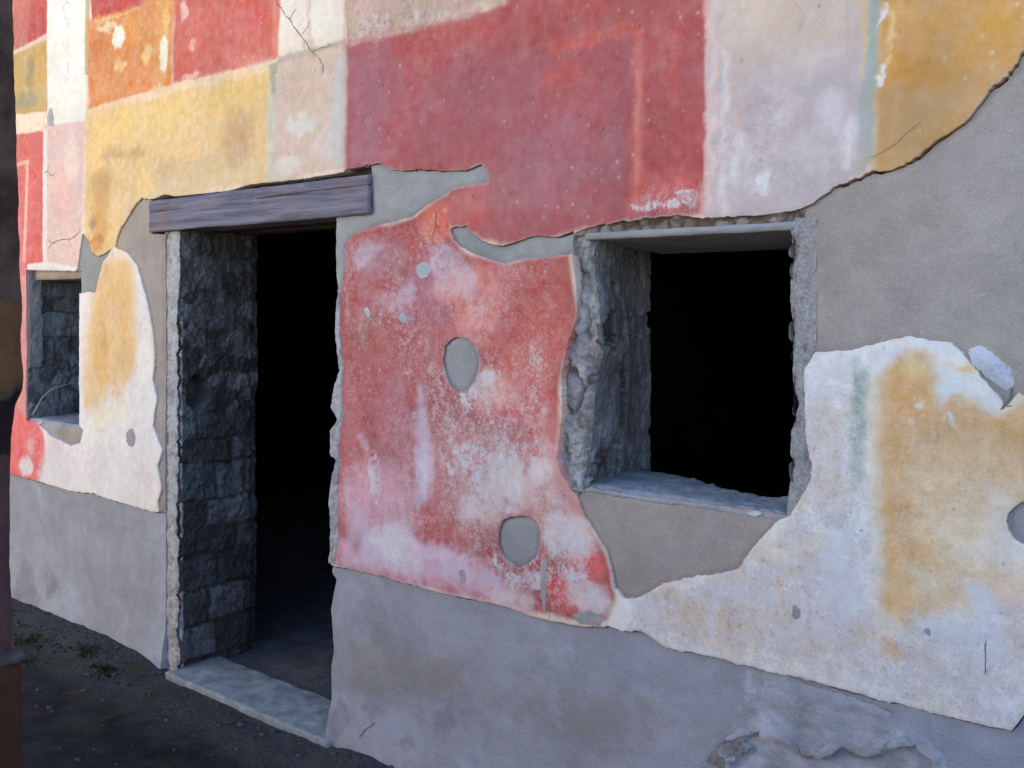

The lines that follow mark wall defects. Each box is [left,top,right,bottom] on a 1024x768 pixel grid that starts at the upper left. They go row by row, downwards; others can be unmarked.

crack [276,0,333,74]
crack [870,119,923,157]
spalling [78,199,186,670]
flaking render [328,164,490,564]
leakage [453,364,507,418]
flaking render [453,56,1024,598]
leakage [325,382,686,768]
flaking render [500,516,547,613]
leakage [725,664,762,742]
spalling [702,670,947,768]